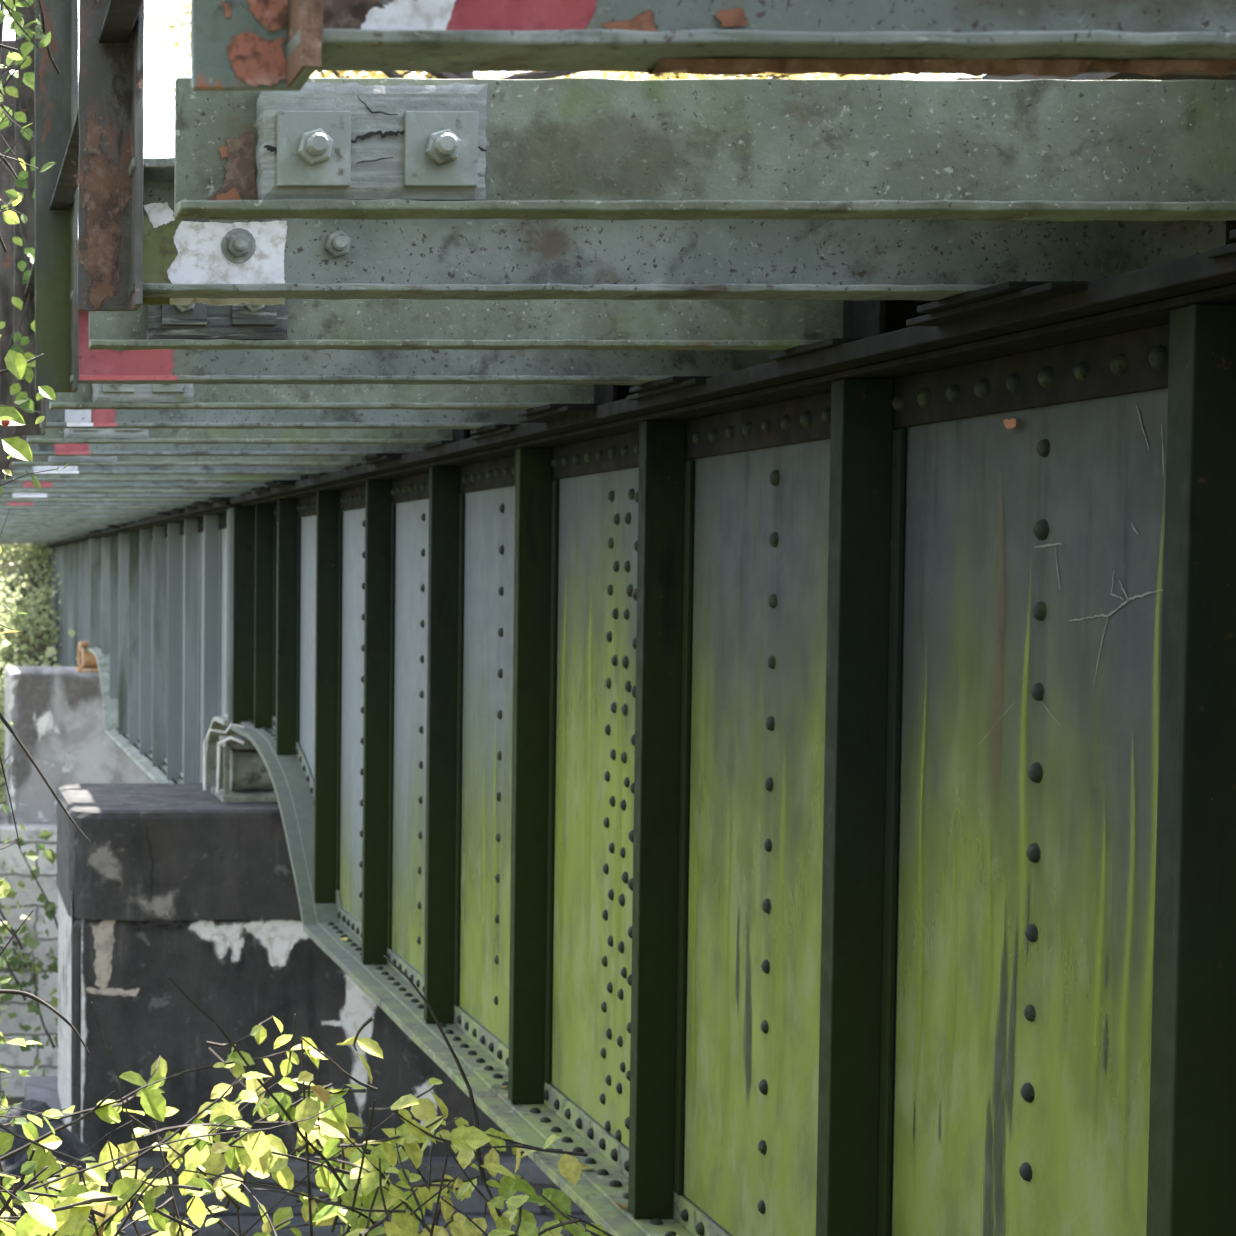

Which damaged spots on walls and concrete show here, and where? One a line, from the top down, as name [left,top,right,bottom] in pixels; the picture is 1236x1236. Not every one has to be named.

peeling [361,0,456,30]
corrosion [601,10,658,32]
corrosion [72,112,132,312]
peeling [142,202,184,305]
corrosion [209,132,258,201]
crack [263,145,277,154]
crack [351,95,404,164]
crack [1069,572,1163,685]
leakage [1146,595,1159,1039]
spalling [85,920,139,997]
leakage [722,832,751,1099]
leakage [983,634,1029,1236]